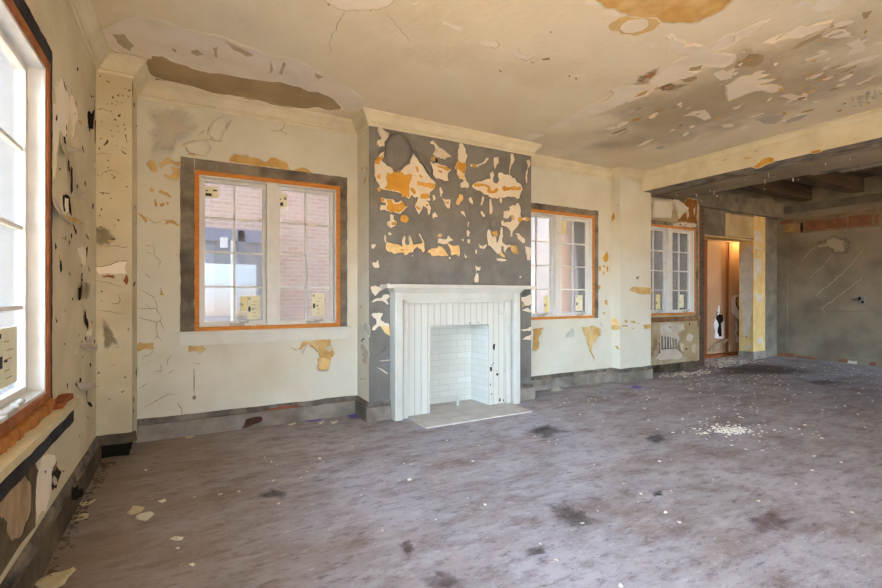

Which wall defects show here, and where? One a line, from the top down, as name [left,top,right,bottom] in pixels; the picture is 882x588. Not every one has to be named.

spalling [145,54,343,111]
peeling [522,0,882,149]
peeling [13,0,136,420]
crack [96,245,185,415]
flaking render [134,153,348,332]
spalling [290,339,335,372]
peeling [361,127,699,363]
spalling [0,454,65,576]